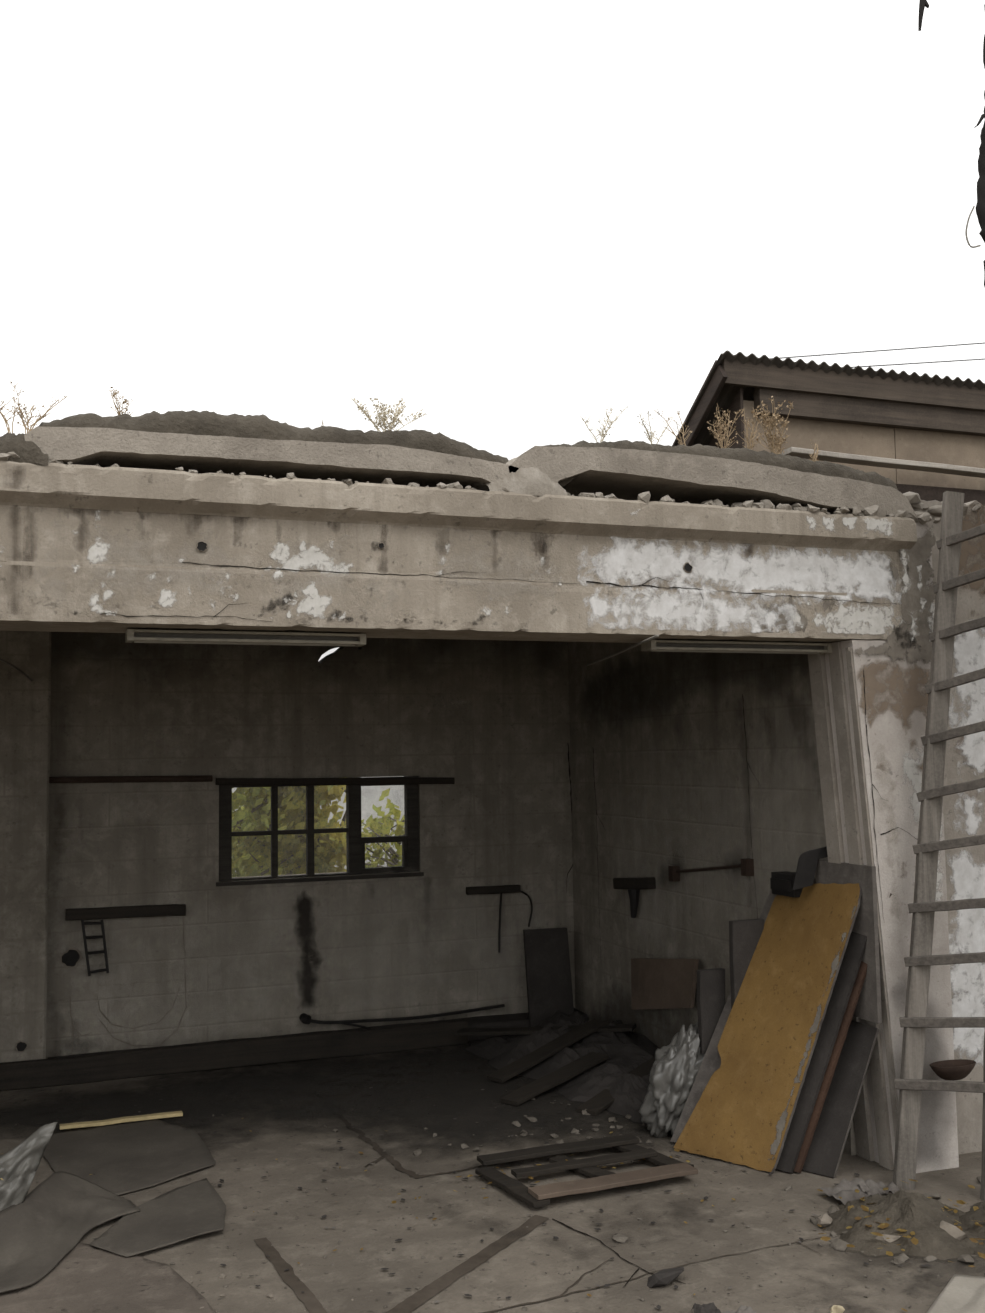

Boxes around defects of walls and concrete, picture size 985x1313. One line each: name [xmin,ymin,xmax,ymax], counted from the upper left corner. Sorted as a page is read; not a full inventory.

peeling [806,516,892,536]
peeling [73,538,115,615]
peeling [150,575,176,607]
crack [101,603,272,622]
peeling [266,541,353,619]
crack [182,562,895,604]
peeling [578,526,937,822]
peeling [948,628,985,772]
peeling [956,788,985,835]
damp [297,896,320,1006]
peeling [936,825,985,1065]
crack [481,1219,837,1313]